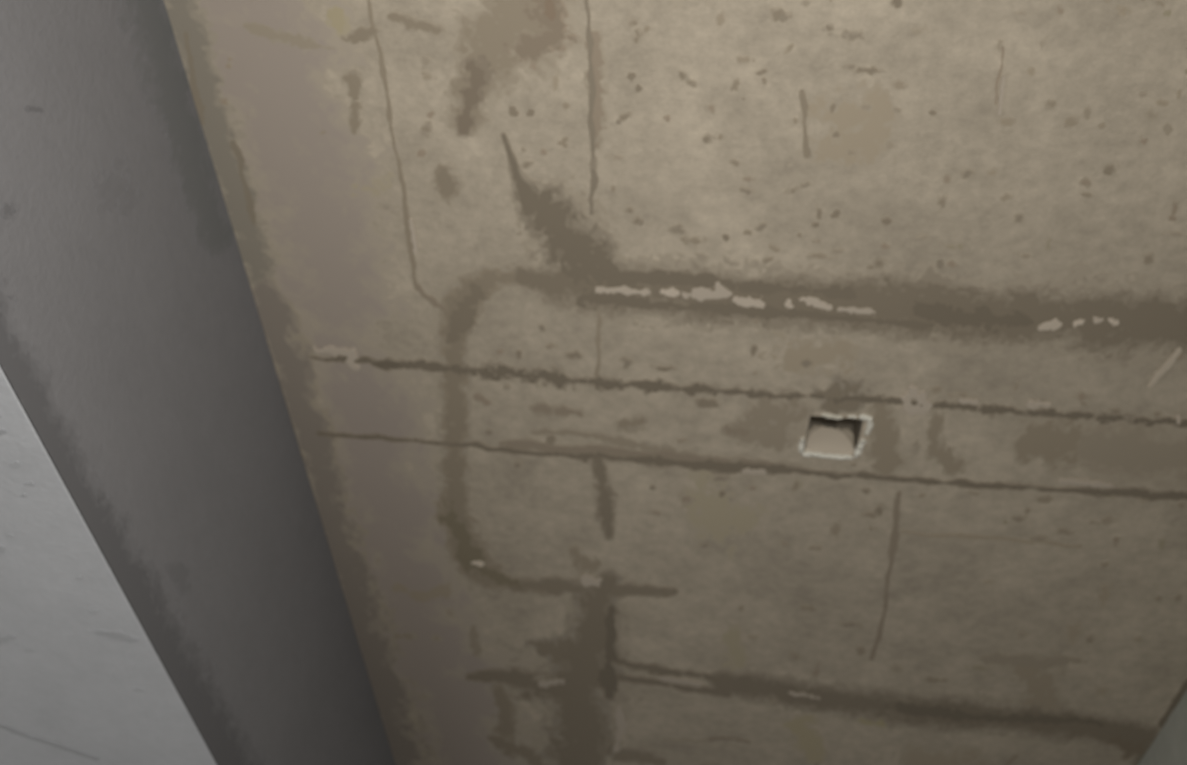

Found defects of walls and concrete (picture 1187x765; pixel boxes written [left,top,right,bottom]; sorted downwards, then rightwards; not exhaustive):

crack [367,0,446,312]
crack [584,0,599,215]
water stain [117,0,609,765]
water stain [498,414,806,542]
crack [308,310,1187,429]
crack [317,431,1187,661]
water stain [425,132,1187,478]
water stain [1012,399,1187,505]
water stain [464,565,1162,765]
crack [1158,680,1187,728]